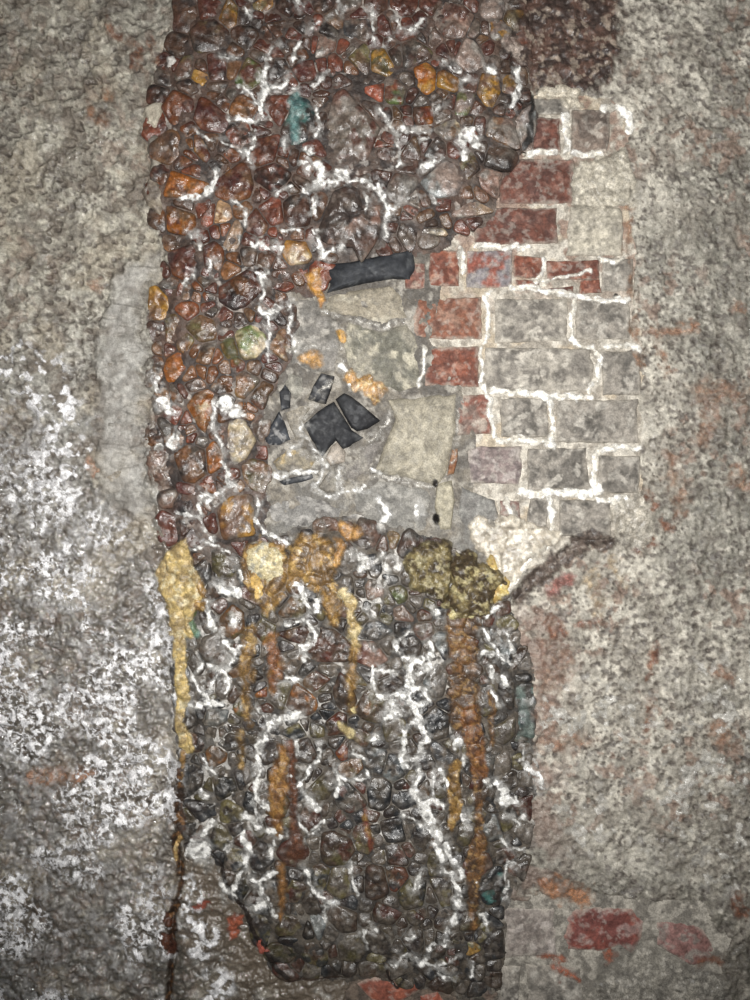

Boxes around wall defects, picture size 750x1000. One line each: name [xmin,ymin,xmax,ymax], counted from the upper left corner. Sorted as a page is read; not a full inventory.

water stain [478,256,642,449]
water stain [0,343,126,644]
spalling [139,0,732,1000]
crack [159,768,186,1000]
water stain [0,395,402,887]
water stain [219,708,301,919]
corrosion [238,624,283,768]
corrosion [268,740,304,920]
corrosion [337,722,355,738]
corrosion [346,646,359,713]
water stain [370,631,478,980]
corrosion [446,608,497,931]